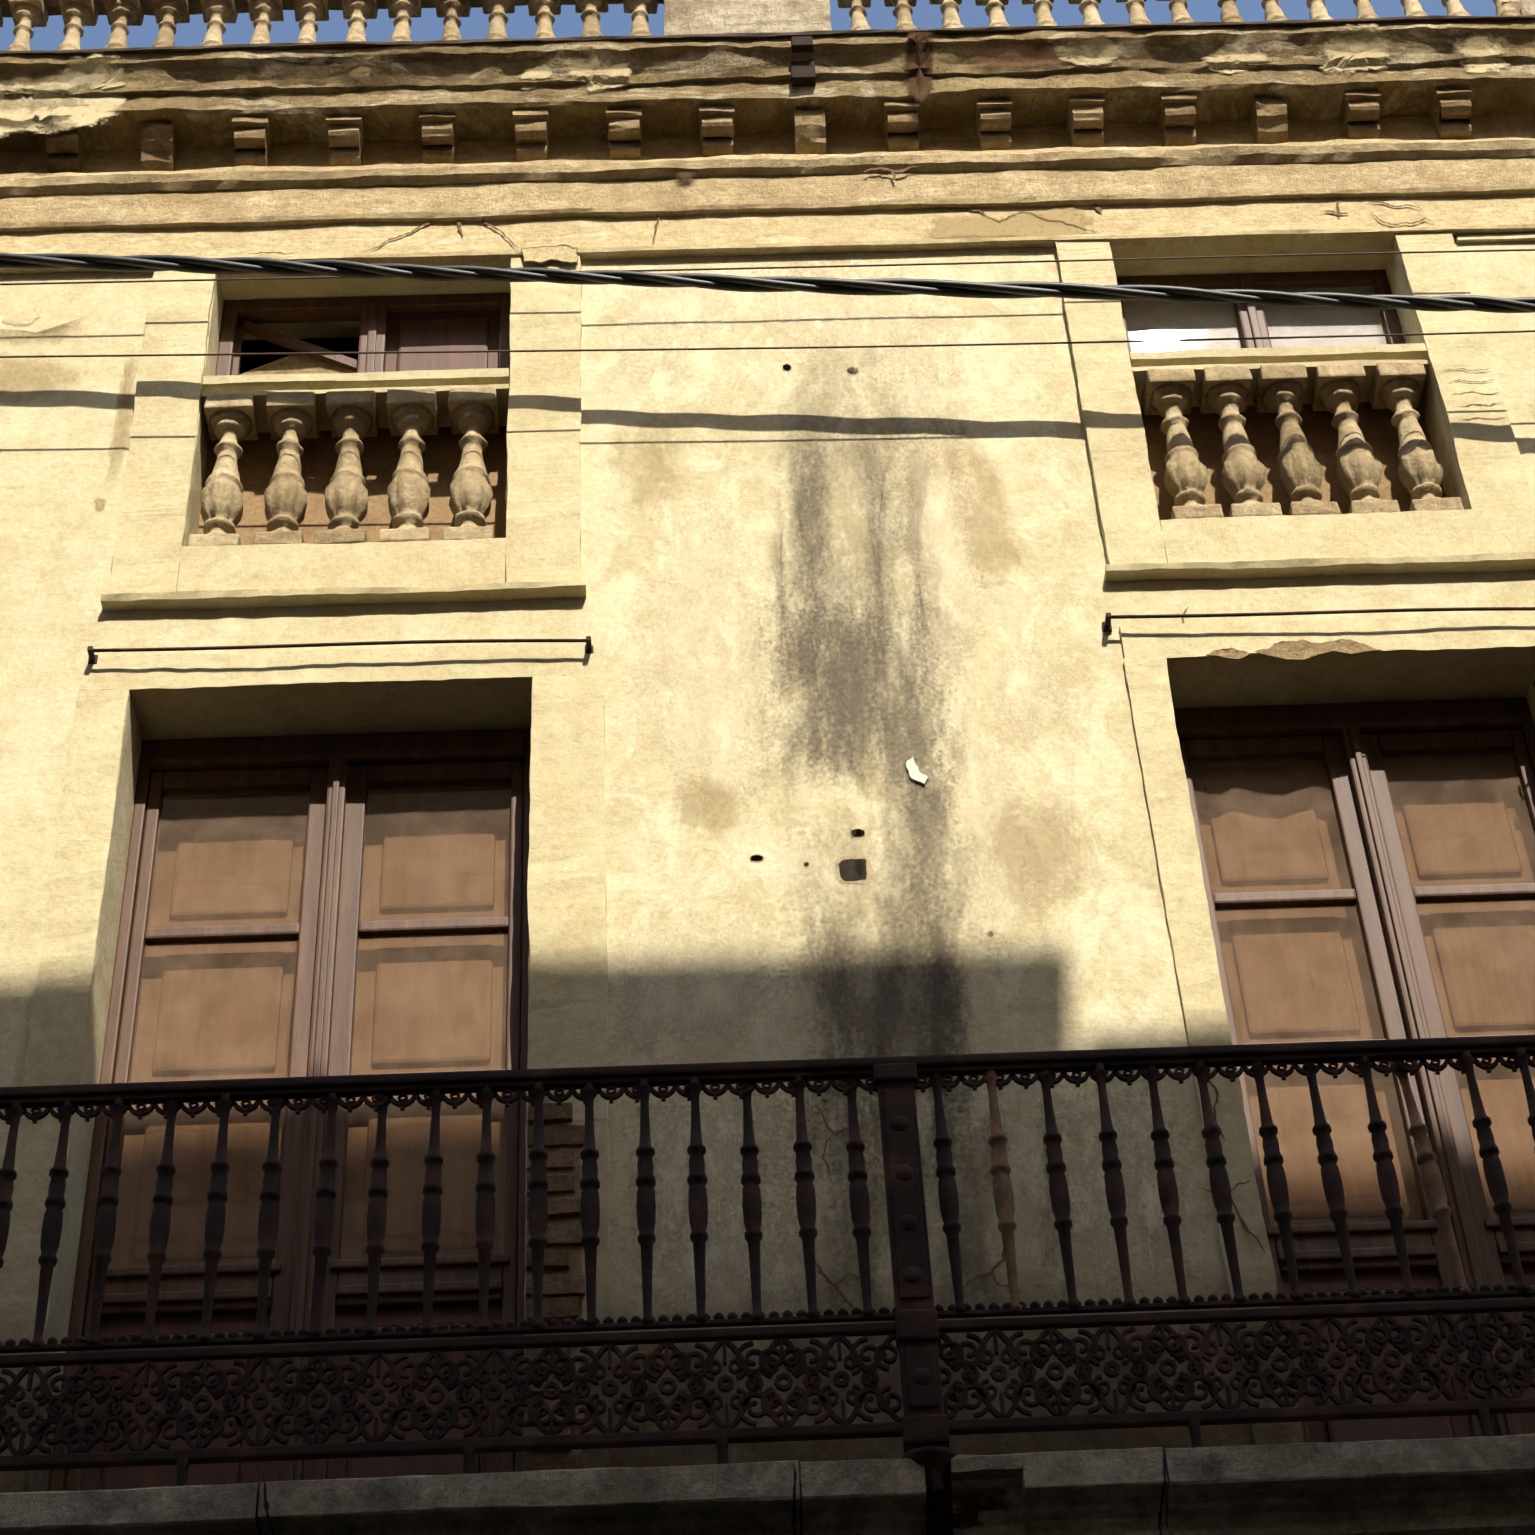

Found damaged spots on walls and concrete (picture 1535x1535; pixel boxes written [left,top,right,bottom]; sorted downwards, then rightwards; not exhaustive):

peeling [0,54,127,137]
peeling [1201,49,1273,74]
peeling [1320,24,1391,73]
peeling [1452,28,1511,73]
crack [249,249,298,257]
crack [362,219,517,253]
water stain [622,287,735,380]
water stain [762,268,955,377]
water stain [899,432,976,678]
spalling [1206,639,1382,661]
water stain [630,1103,795,1308]
water stain [1056,1093,1199,1291]